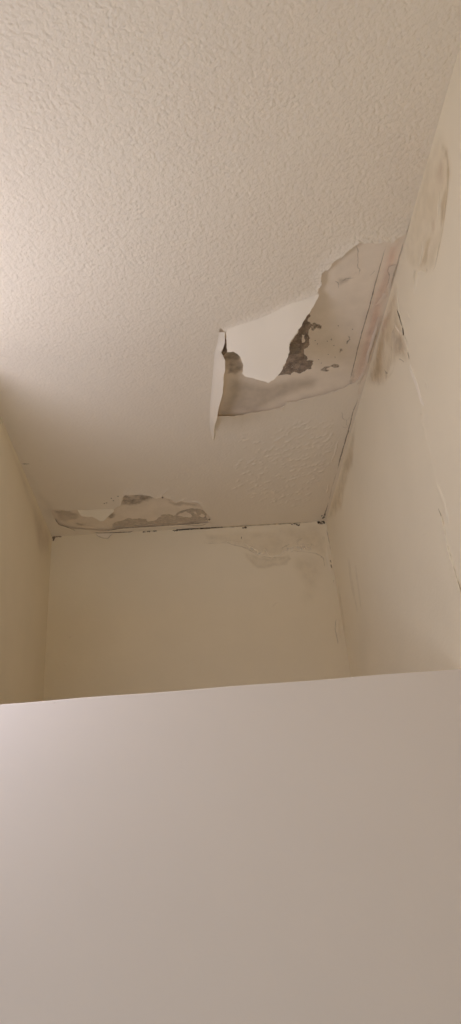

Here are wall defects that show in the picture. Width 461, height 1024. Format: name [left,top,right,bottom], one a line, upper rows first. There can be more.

peeling [210,219,411,441]